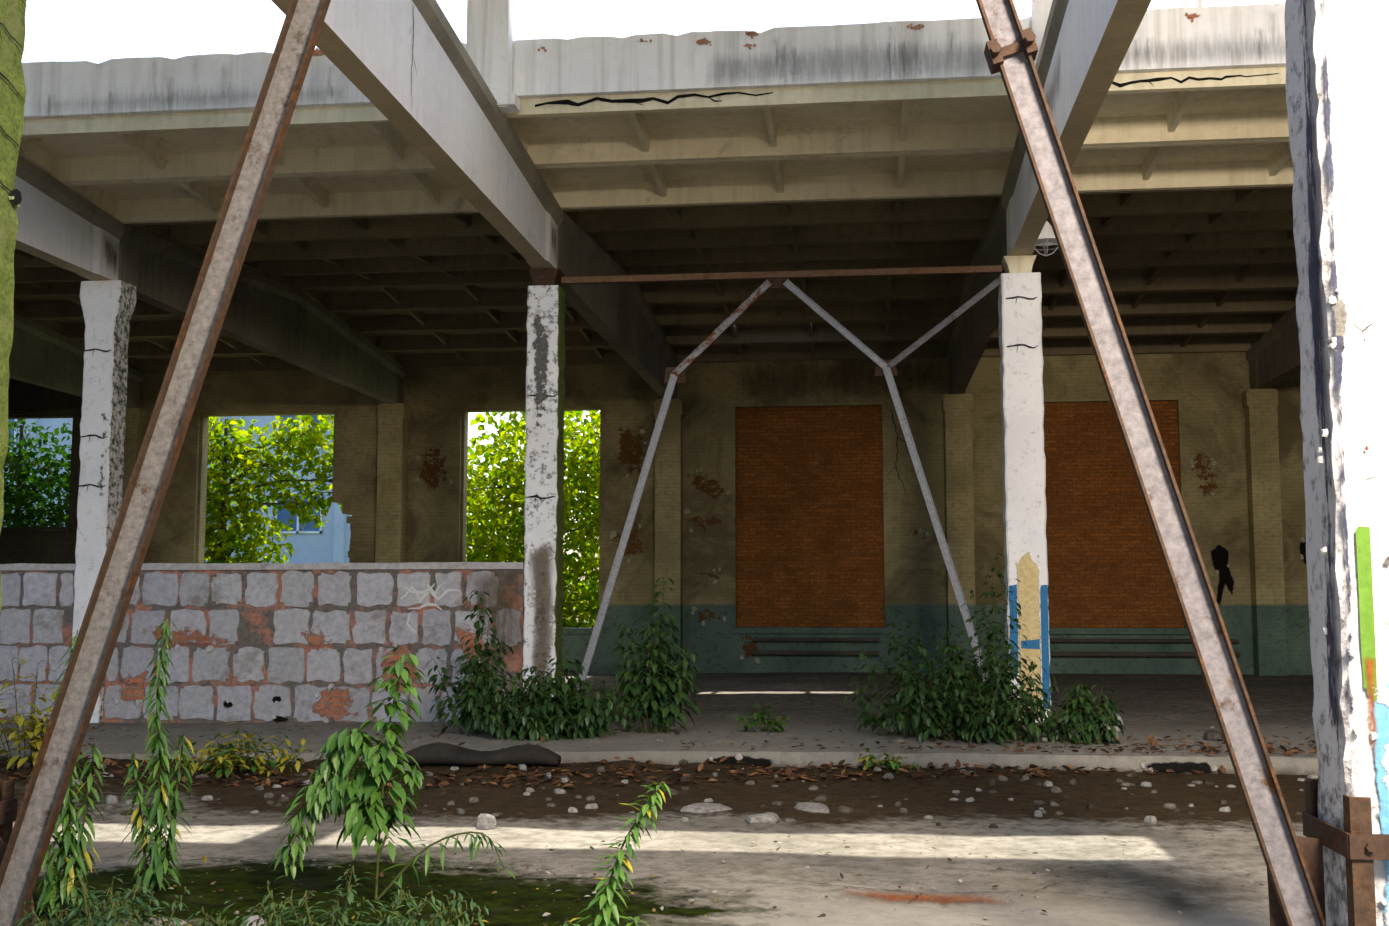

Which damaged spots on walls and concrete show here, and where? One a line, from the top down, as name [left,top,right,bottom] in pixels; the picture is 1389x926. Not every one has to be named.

crack [535,92,773,107]
crack [1112,73,1279,88]
peeling [532,309,552,442]
peeling [530,548,553,682]
spalling [312,683,358,723]
peeling [1379,860,1389,926]